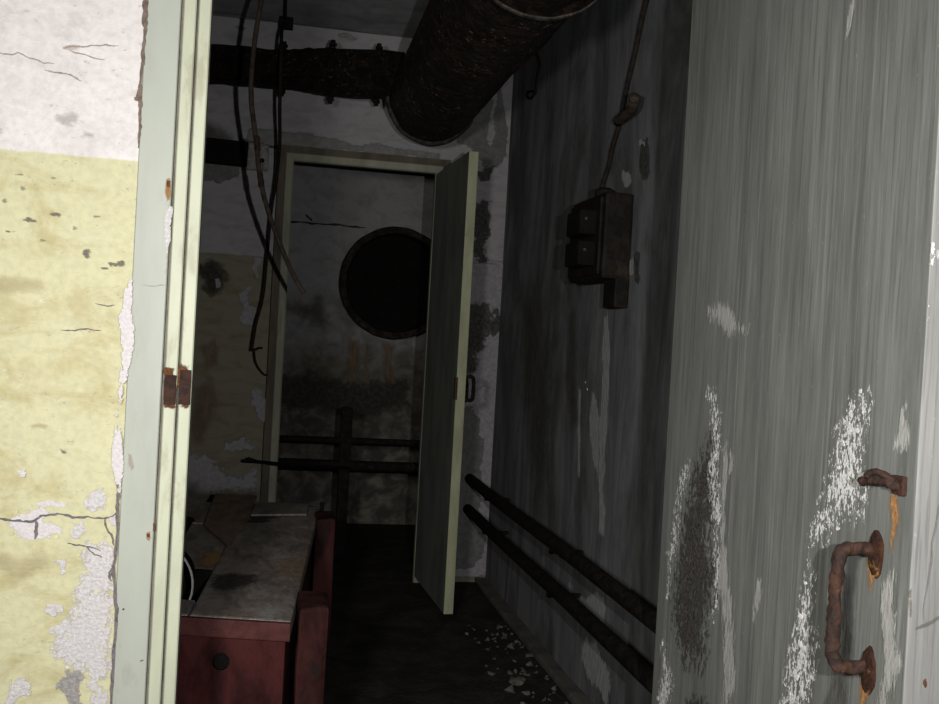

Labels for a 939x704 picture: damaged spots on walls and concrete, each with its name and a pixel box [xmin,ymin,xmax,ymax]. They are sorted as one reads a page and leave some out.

crack [1,44,118,81]
rust [163,364,188,387]
peeling [9,279,135,704]
crack [0,498,119,558]
rust [890,495,898,545]
peeling [4,677,32,704]